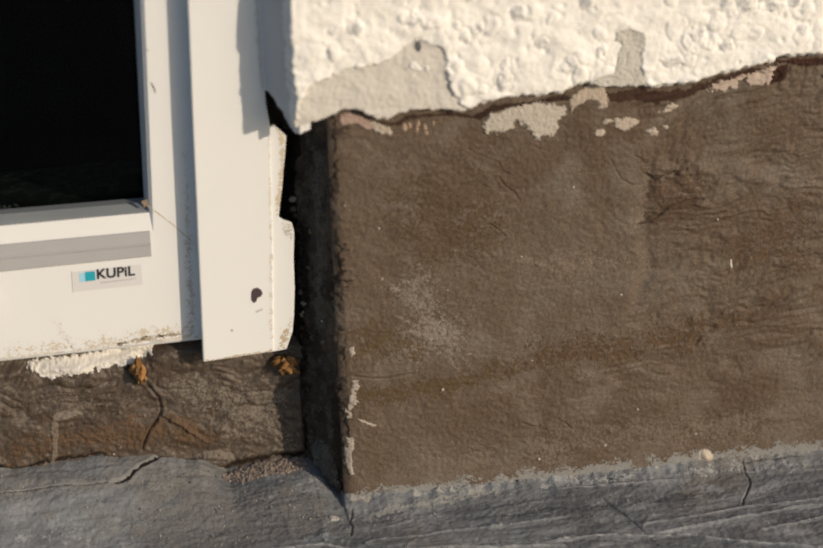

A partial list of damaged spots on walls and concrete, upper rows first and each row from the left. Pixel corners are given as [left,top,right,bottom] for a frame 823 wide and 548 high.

spalling [294,37,468,136]
peeling [482,84,609,141]
peeling [594,116,639,137]
peeling [706,65,777,95]
crack [142,382,162,448]
crack [0,453,101,469]